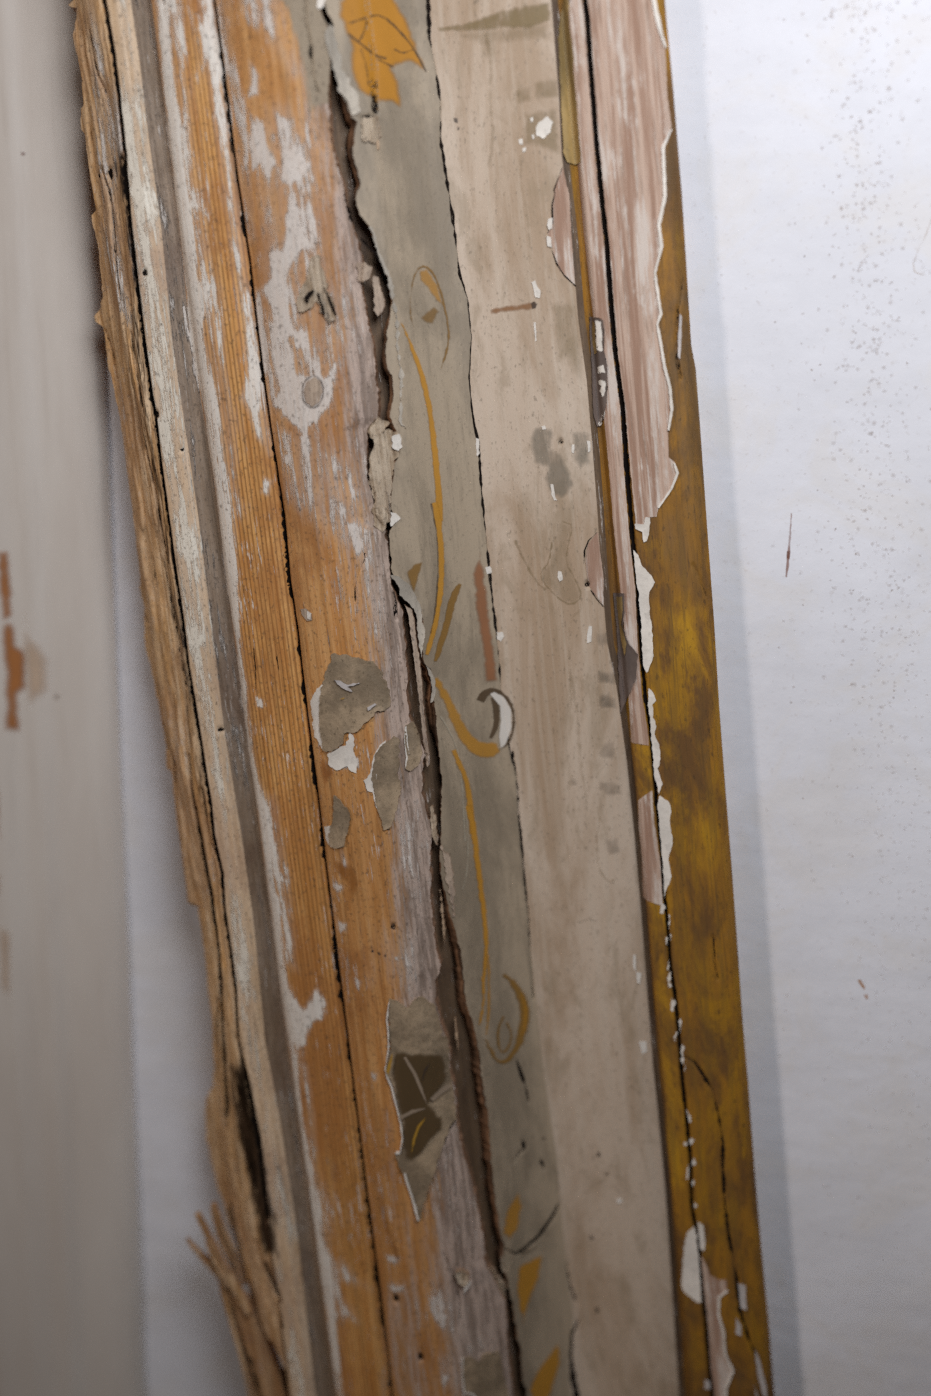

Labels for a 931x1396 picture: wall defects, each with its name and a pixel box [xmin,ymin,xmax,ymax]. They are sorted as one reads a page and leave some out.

spalling [304,288,336,315]
crack [426,0,501,683]
crack [91,0,280,1295]
crack [215,2,394,1396]
peeling [324,795,351,848]
peeling [310,575,436,830]
crack [507,736,533,994]
peeling [518,0,686,1072]
peeling [384,996,457,1221]
crack [516,1060,529,1101]
crack [504,1204,559,1255]
peeling [681,1203,747,1396]